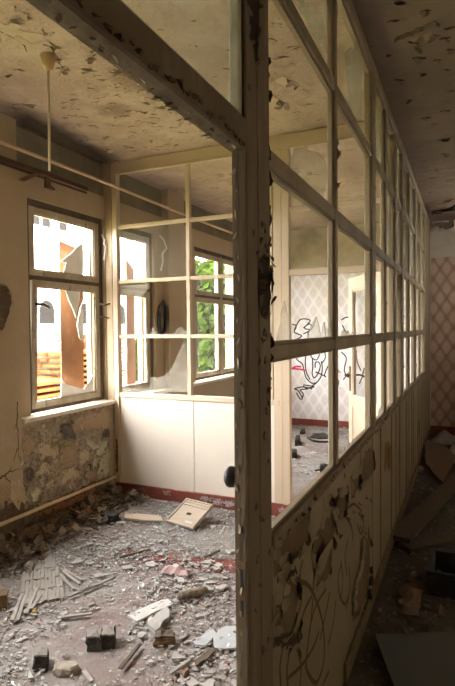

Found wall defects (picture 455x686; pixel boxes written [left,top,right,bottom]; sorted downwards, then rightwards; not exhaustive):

peeling [40,28,70,76]
peeling [81,37,245,153]
peeling [269,90,312,114]
spalling [0,283,14,333]
spalling [0,405,114,539]
peeling [262,401,402,660]